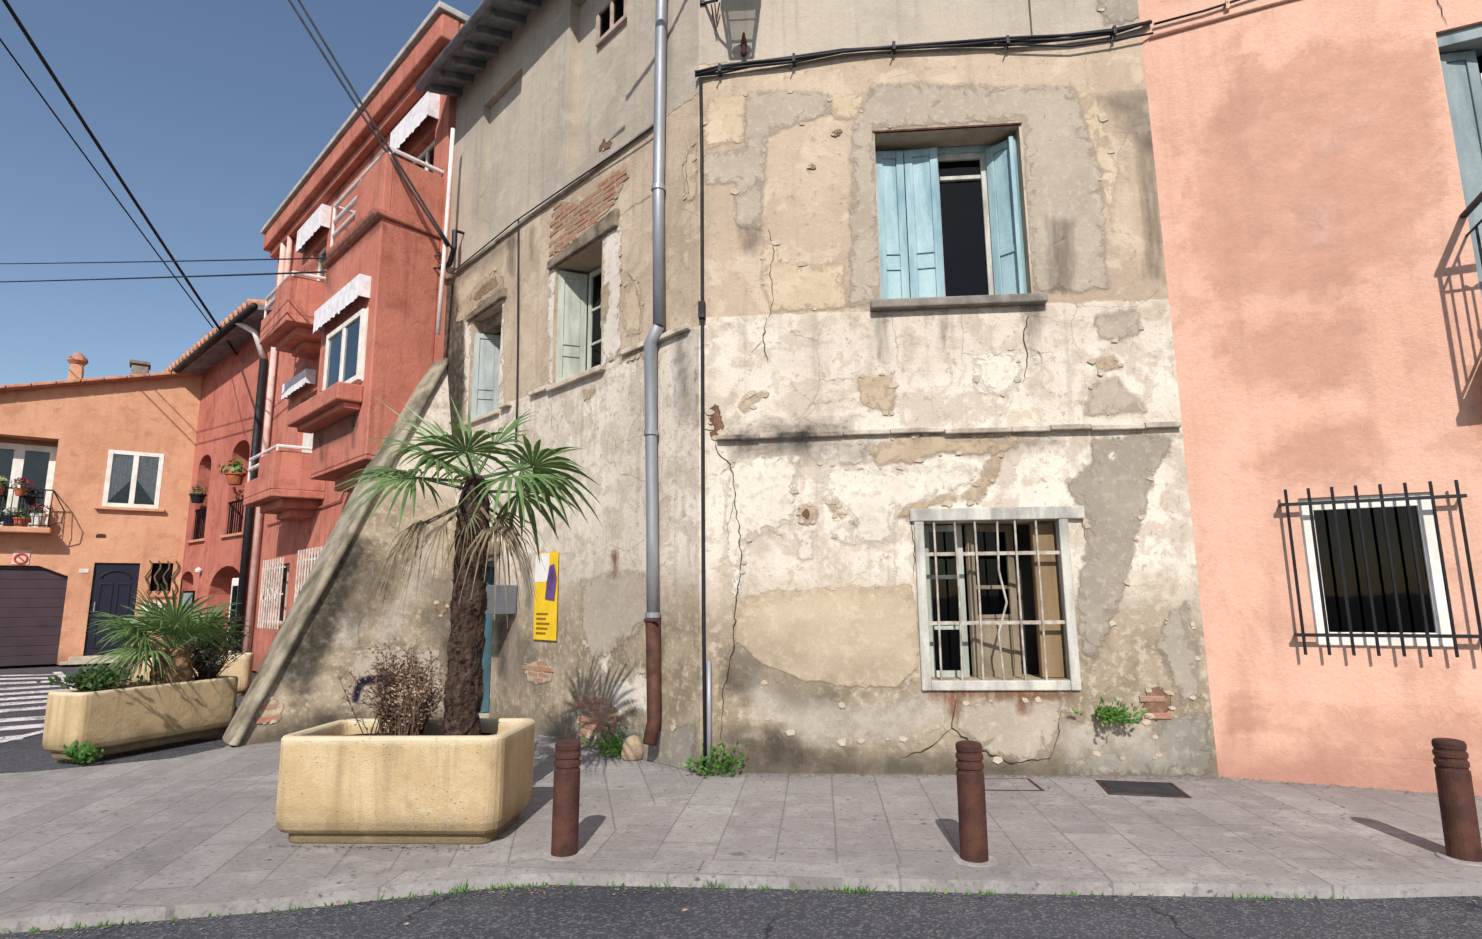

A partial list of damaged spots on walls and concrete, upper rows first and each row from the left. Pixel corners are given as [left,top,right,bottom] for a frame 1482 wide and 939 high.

flaking render [682,92,748,201]
flaking render [549,164,629,257]
flaking render [760,230,846,316]
flaking render [858,372,899,416]
flaking render [972,345,1023,397]
flaking render [1087,338,1124,389]
flaking render [723,433,1037,597]
leakage [285,540,364,683]
crack [712,419,742,737]
flaking render [575,640,647,753]
crack [901,700,1062,764]
flaking render [1138,601,1201,759]